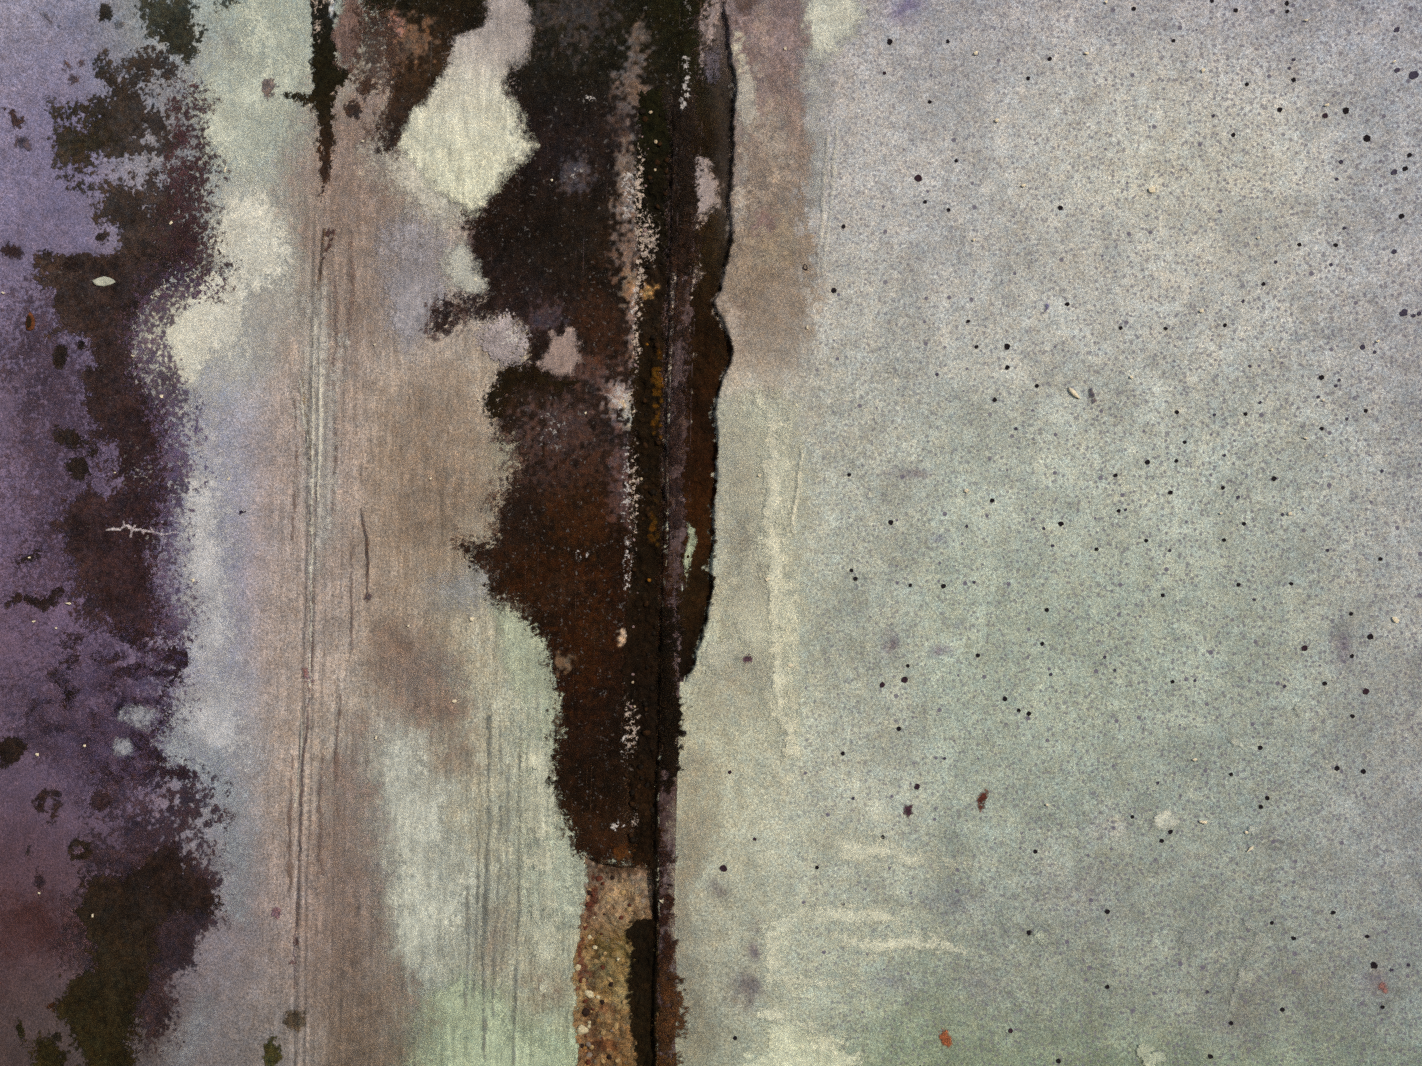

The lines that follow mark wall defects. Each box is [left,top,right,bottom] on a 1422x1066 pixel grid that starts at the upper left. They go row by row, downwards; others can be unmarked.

damp [0,0,242,1066]
peeling [353,560,660,1066]
damp [262,0,825,1066]